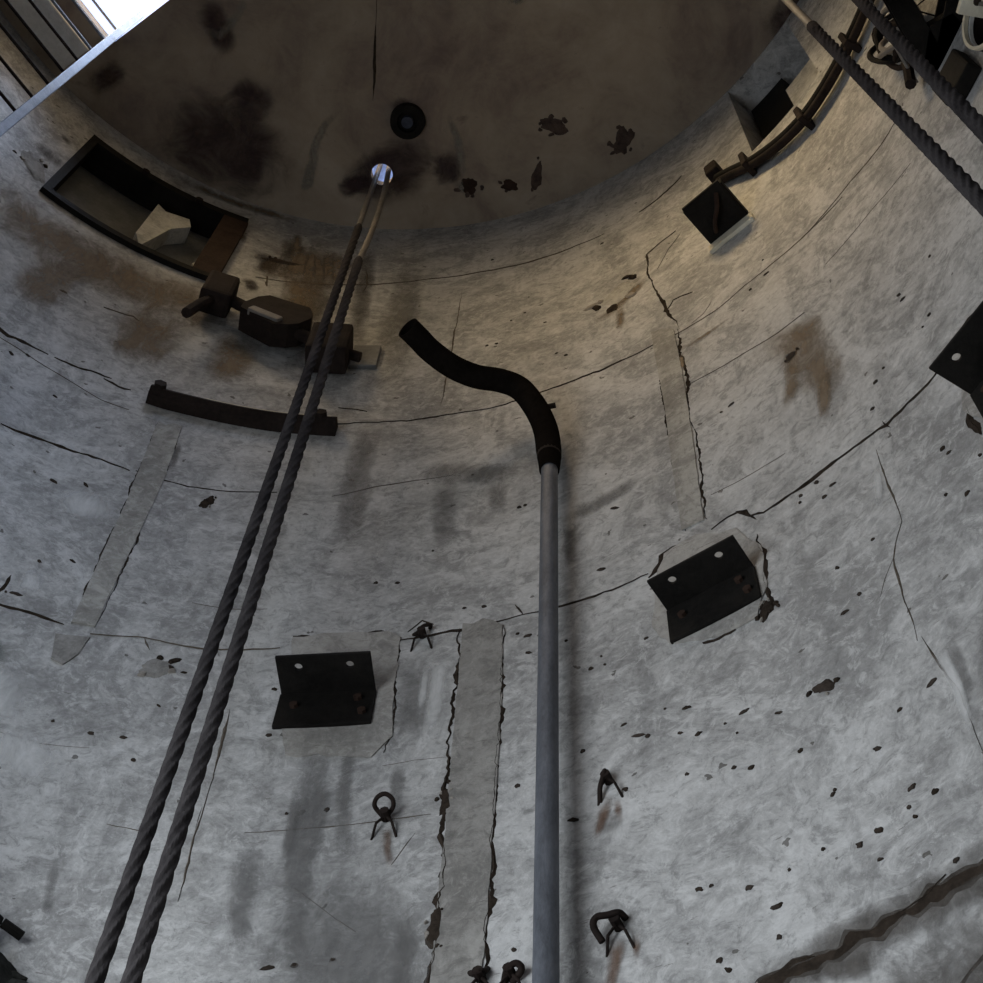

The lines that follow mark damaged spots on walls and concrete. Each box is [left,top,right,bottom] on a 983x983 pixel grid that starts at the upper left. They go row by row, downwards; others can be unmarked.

water stain [169,83,282,218]
spalling [538,114,569,137]
spalling [607,125,635,155]
crack [639,108,910,335]
crack [0,327,131,410]
crack [338,377,515,424]
crack [540,345,653,393]
spalling [100,532,140,618]
crack [711,373,983,753]
spalling [51,633,90,665]
water stain [286,914,410,983]
crack [755,859,983,983]